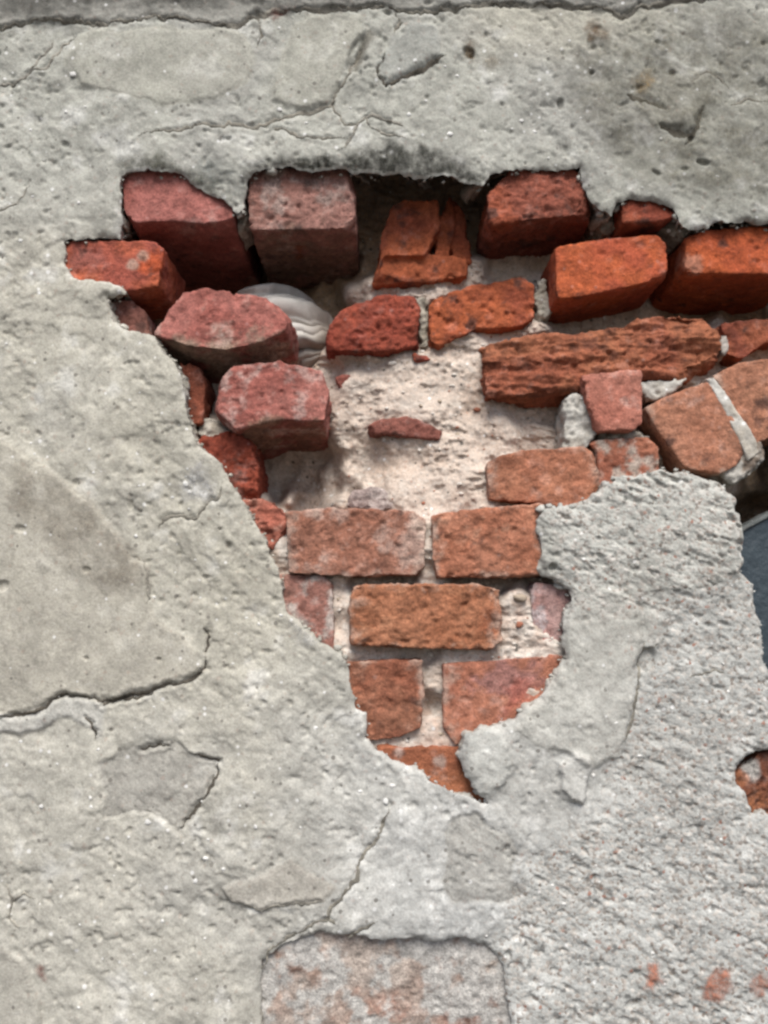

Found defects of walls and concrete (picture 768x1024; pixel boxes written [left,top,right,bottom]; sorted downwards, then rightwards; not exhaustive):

crack [0,0,706,150]
spalling [64,168,149,277]
spalling [232,166,294,251]
spalling [148,319,232,455]
flaking render [0,440,200,737]
spalling [261,167,768,903]
crack [1,627,211,739]
crack [141,742,169,750]
flaking render [101,740,217,831]
crack [178,754,220,830]
crack [6,884,36,928]
crack [240,803,393,968]